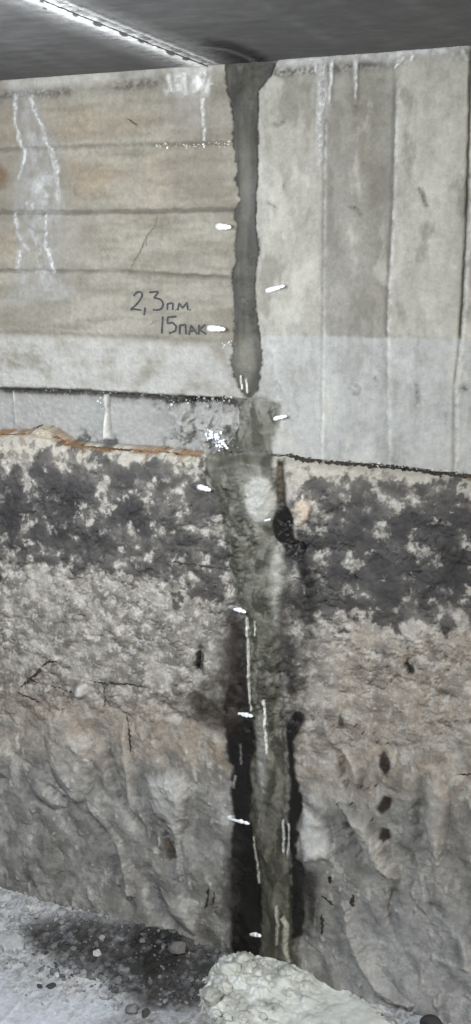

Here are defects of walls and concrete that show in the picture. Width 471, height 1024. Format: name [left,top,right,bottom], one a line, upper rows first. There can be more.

corrosion [133,447,166,456]
water stain [276,466,284,499]